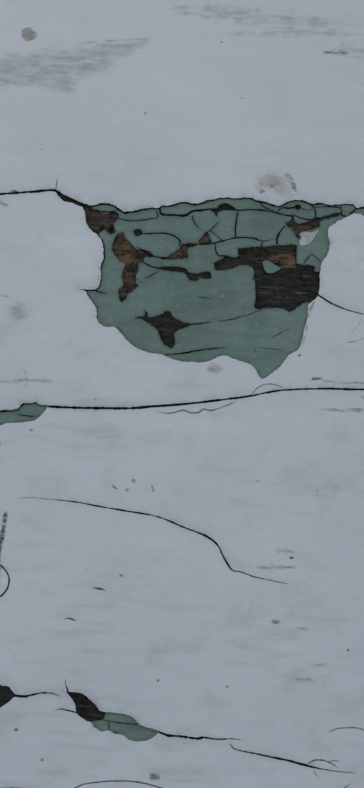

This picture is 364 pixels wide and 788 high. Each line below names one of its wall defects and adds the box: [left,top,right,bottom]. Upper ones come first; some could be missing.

crack [0,188,60,196]
peeling [52,189,364,379]
peeling [0,402,48,425]
crack [48,387,364,414]
crack [33,497,287,584]
peeling [0,680,233,741]
crack [230,744,353,788]